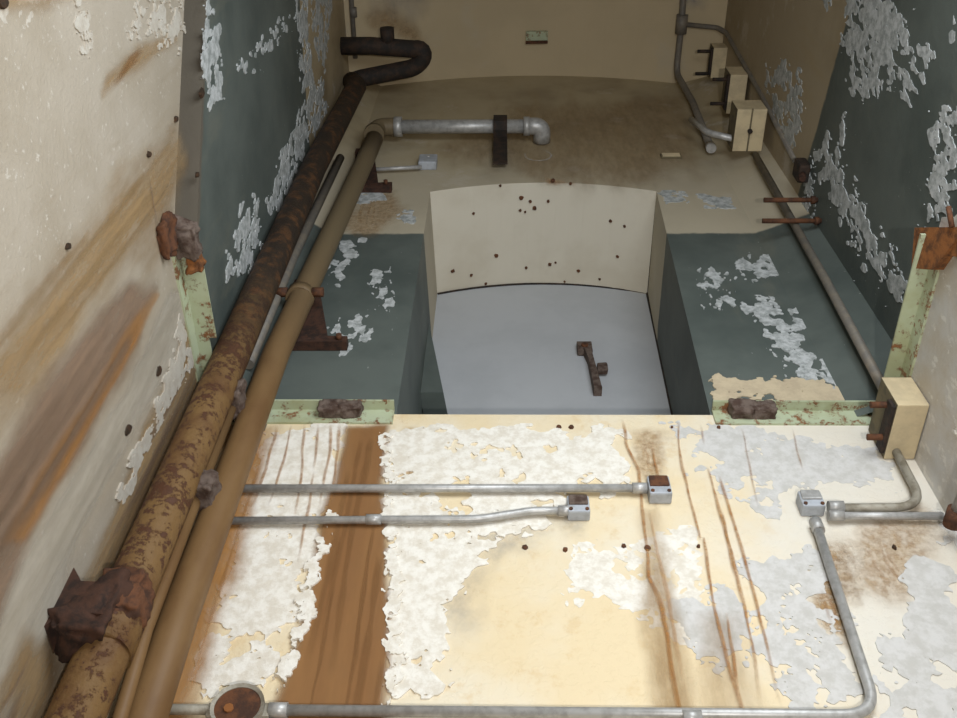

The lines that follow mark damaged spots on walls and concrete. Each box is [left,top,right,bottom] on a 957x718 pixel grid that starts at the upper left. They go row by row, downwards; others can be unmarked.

damp [106,41,164,86]
peeling [225,0,333,283]
peeling [801,111,908,307]
peeling [839,0,936,108]
peeling [917,105,957,226]
peeling [696,254,844,400]
damp [0,293,185,714]
peeling [195,423,348,699]
corrosion [277,425,389,705]
peeling [378,423,632,705]
peeling [561,525,957,718]
damp [816,548,845,632]